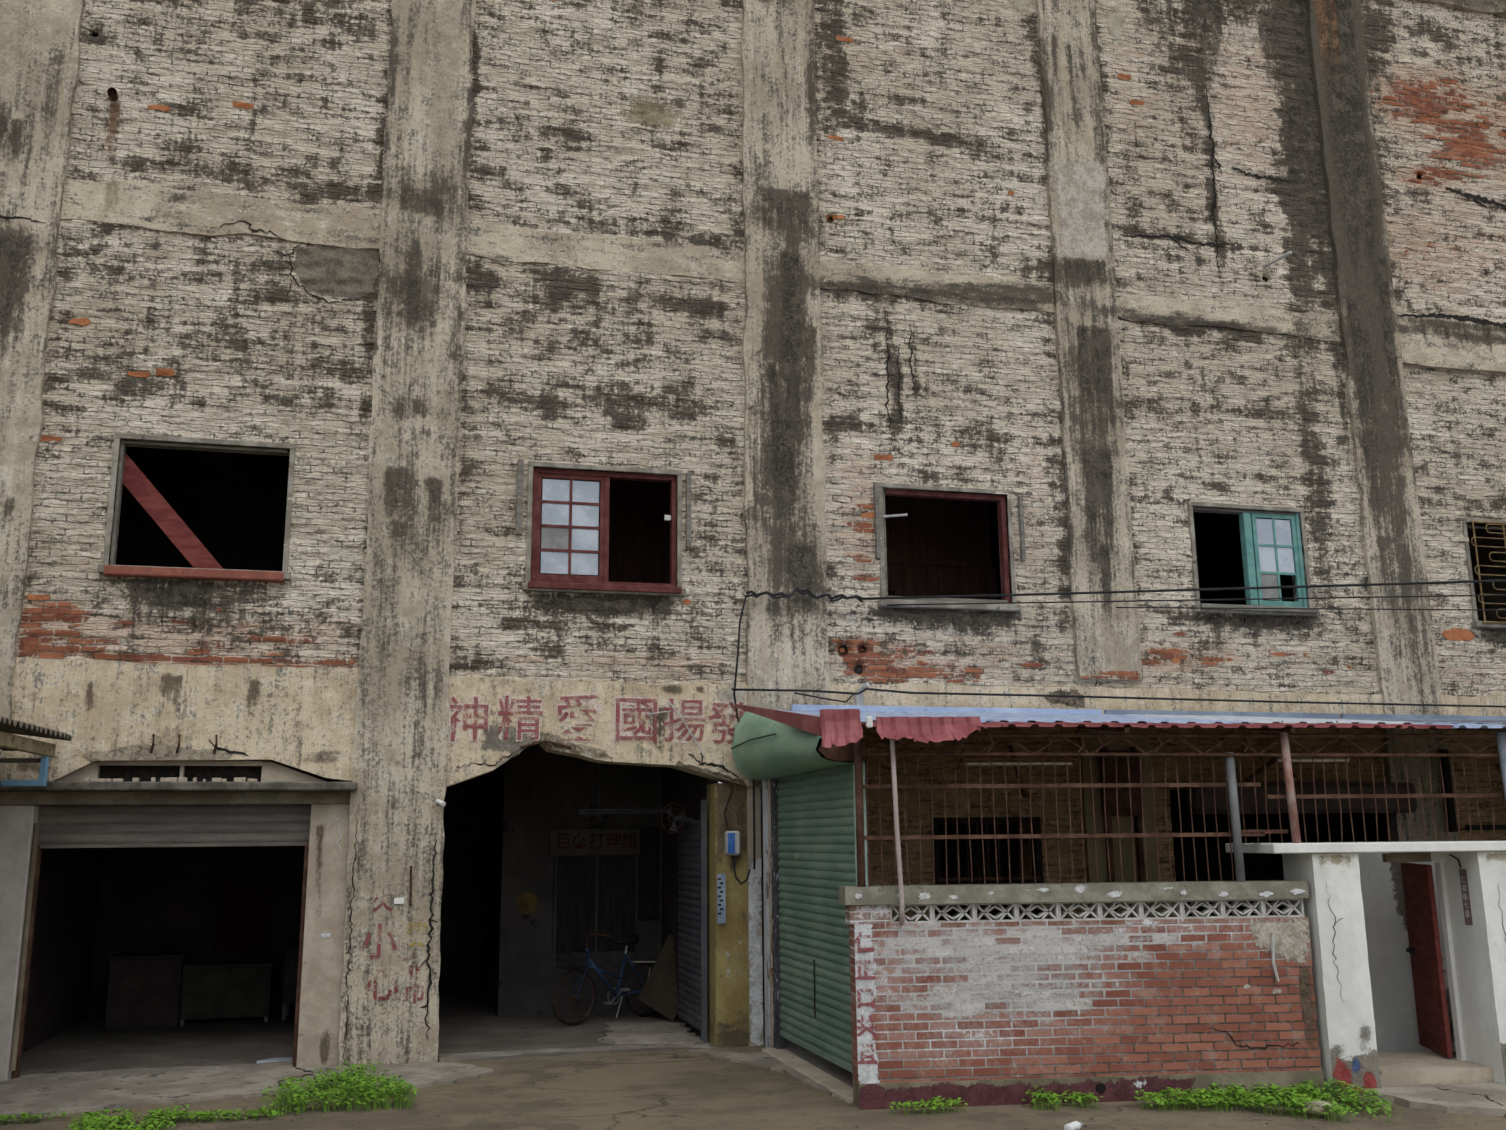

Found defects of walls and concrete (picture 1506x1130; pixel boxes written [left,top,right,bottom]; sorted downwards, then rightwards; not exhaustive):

peeling [1369,74,1506,181]
leakage [0,225,49,364]
crack [220,220,358,303]
leakage [1131,0,1506,509]
leakage [764,250,818,636]
leakage [1077,325,1116,626]
peeling [18,594,356,668]
peeling [831,636,983,683]
crack [420,840,437,1039]
peeling [1250,917,1310,964]
crack [1326,885,1344,1001]
peeling [854,921,1213,1110]